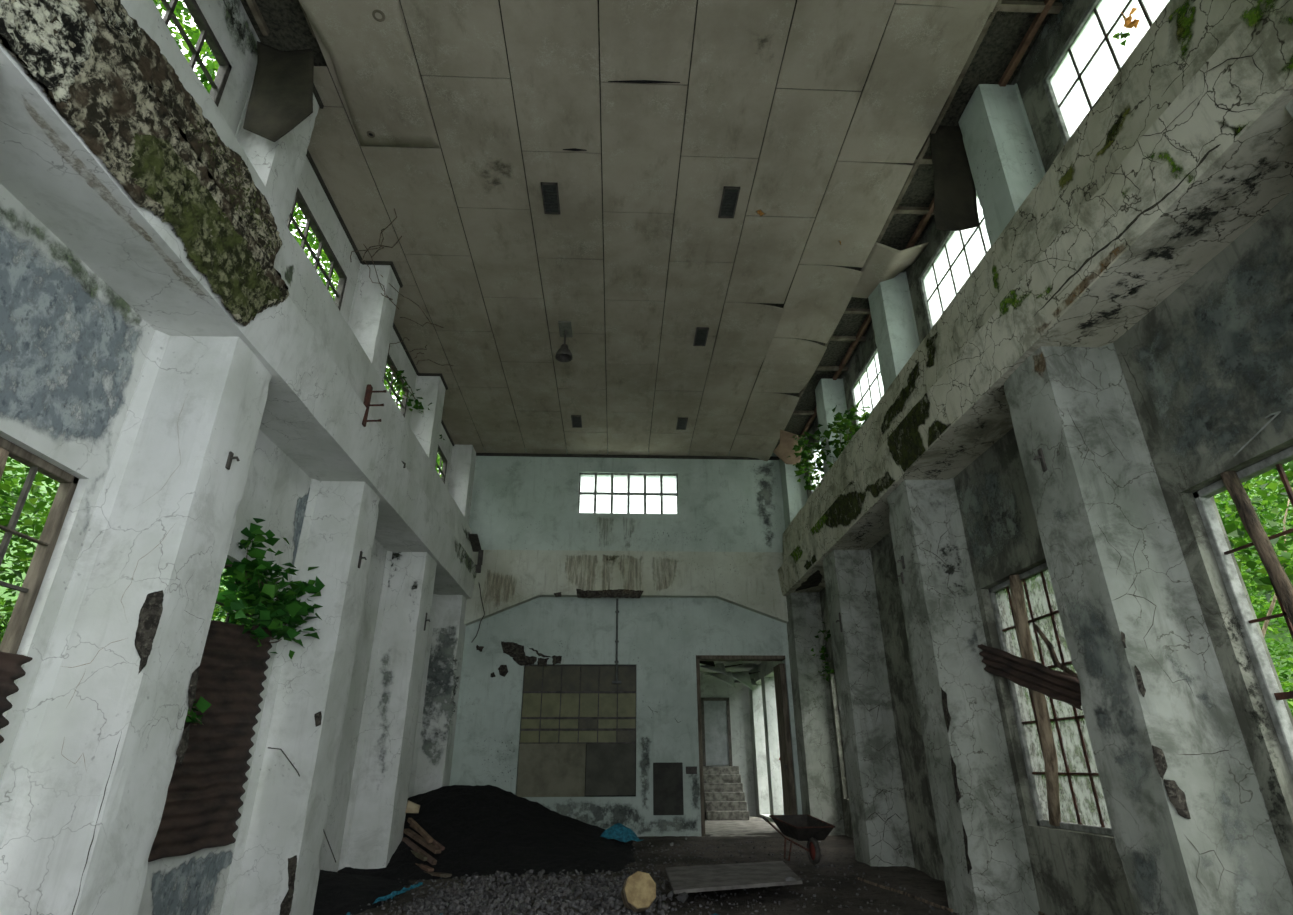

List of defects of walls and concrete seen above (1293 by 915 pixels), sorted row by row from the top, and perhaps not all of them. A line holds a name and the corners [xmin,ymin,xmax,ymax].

flaking render [0,0,289,326]
leakage [1081,144,1277,334]
spalling [134,590,164,674]
leakage [421,626,459,764]
peeling [491,641,562,677]
crack [1098,525,1194,696]
spalling [279,855,297,915]
crack [1186,837,1238,889]